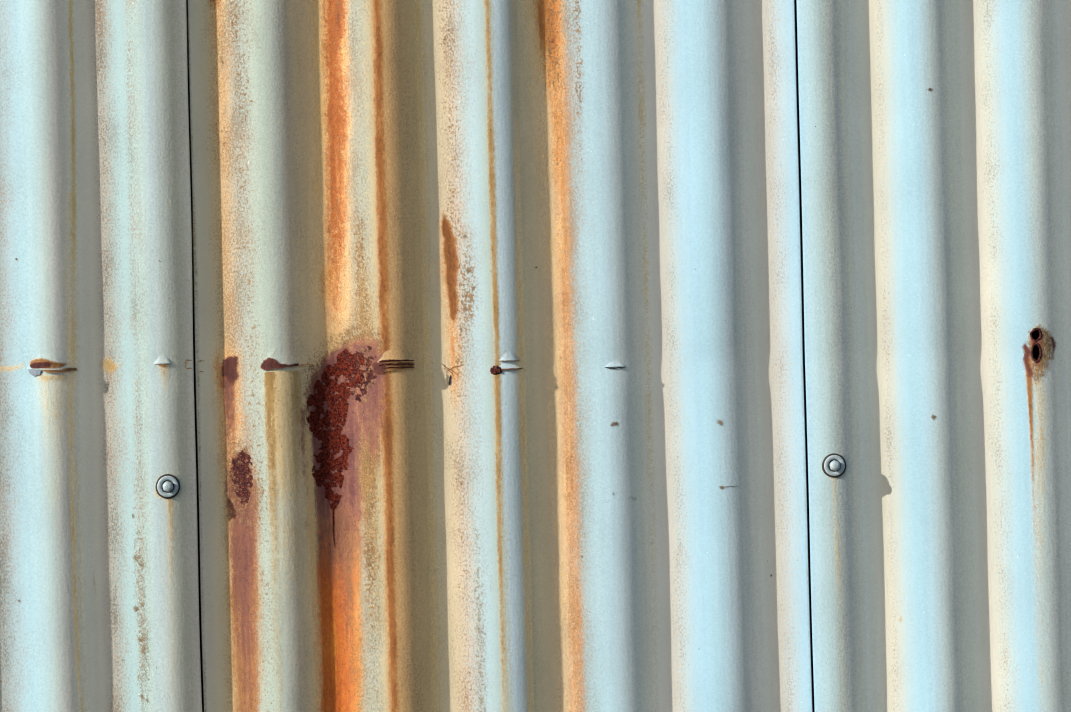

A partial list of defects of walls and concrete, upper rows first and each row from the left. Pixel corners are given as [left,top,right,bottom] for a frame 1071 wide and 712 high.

corrosion [216,356,262,712]
corrosion [300,0,398,712]
corrosion [441,214,477,380]
corrosion [485,0,504,687]
corrosion [523,0,584,252]